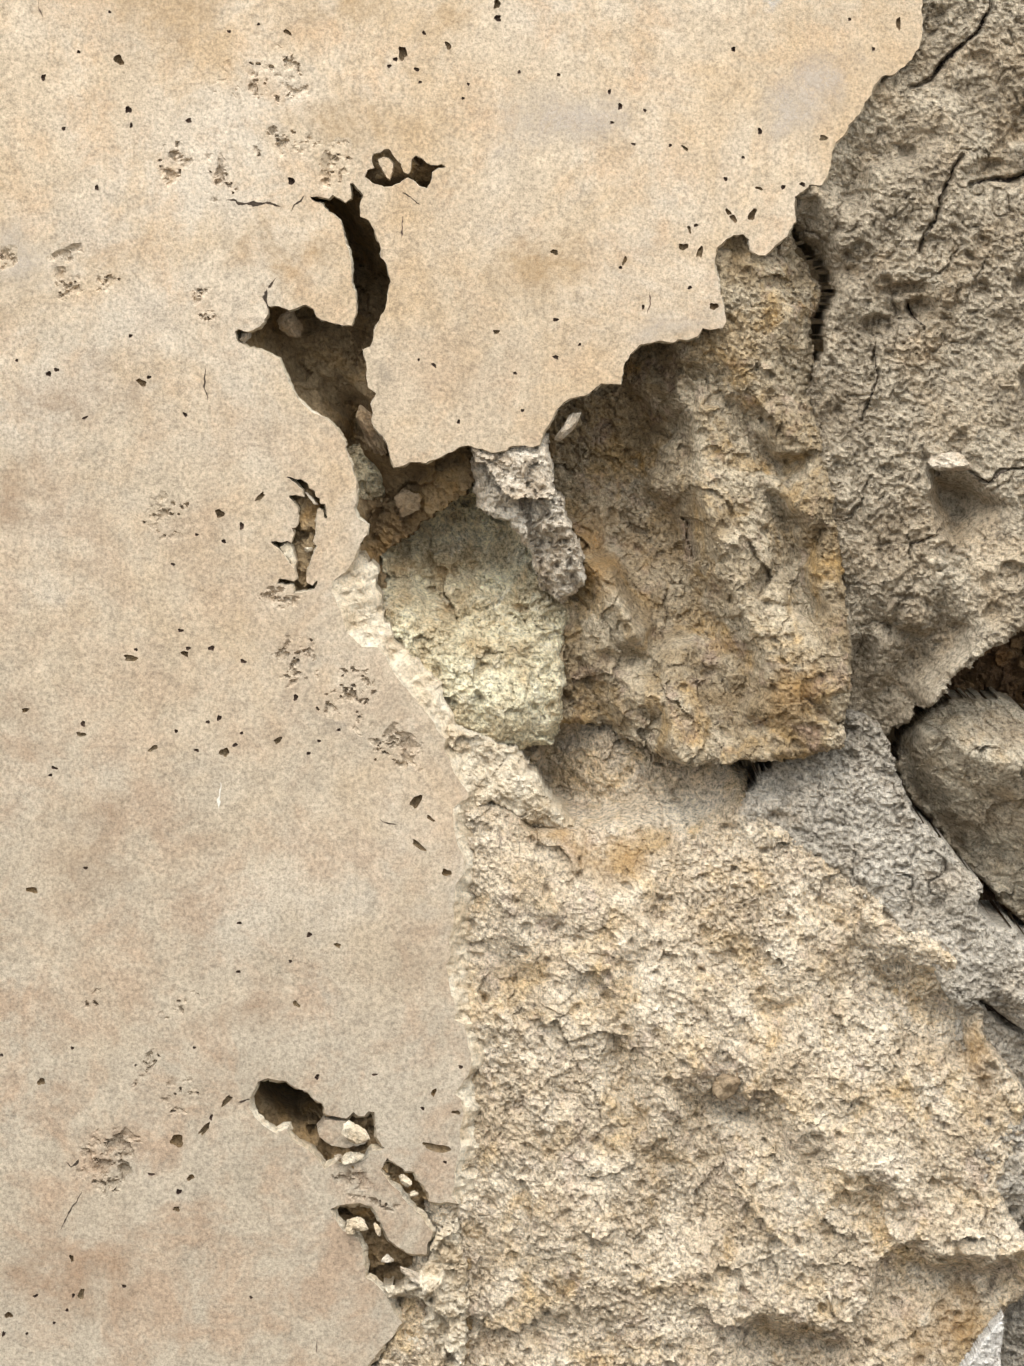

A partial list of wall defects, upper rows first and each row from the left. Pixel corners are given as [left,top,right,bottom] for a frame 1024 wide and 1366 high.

crack [227,183,391,560]
spalling [387,0,924,468]
crack [551,231,852,767]
crack [915,0,990,87]
spalling [130,477,485,1366]
spalling [960,1309,1004,1366]